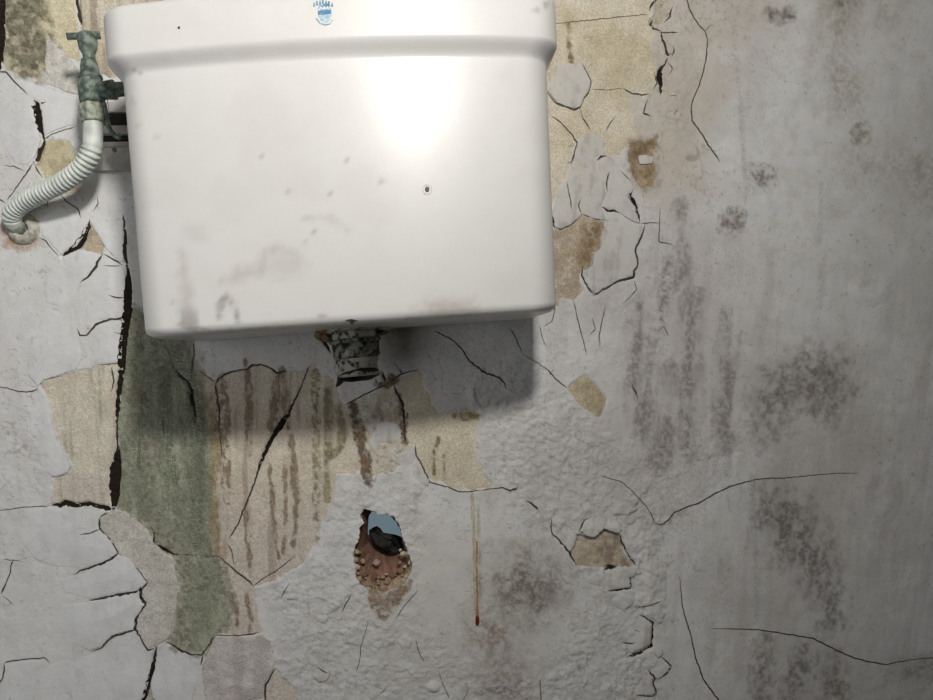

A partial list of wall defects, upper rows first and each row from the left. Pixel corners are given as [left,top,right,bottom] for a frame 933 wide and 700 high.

crack [0,0,74,203]
crack [75,0,83,25]
peeling [0,0,163,179]
flaking render [546,0,658,307]
crack [510,0,720,388]
crack [0,195,260,700]
crack [151,340,309,598]
flaking render [0,208,492,700]
rust [471,493,479,626]
flaking render [553,516,636,610]
crack [346,362,932,700]
water stain [761,500,835,624]